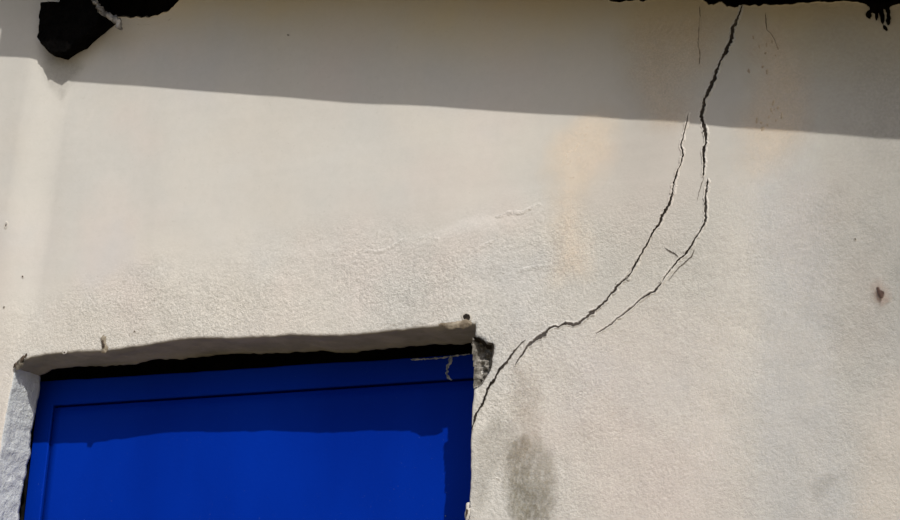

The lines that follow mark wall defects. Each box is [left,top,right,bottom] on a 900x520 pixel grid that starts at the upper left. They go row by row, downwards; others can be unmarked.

crack [472,5,744,432]
spalling [438,312,472,329]
flaking render [472,337,494,388]